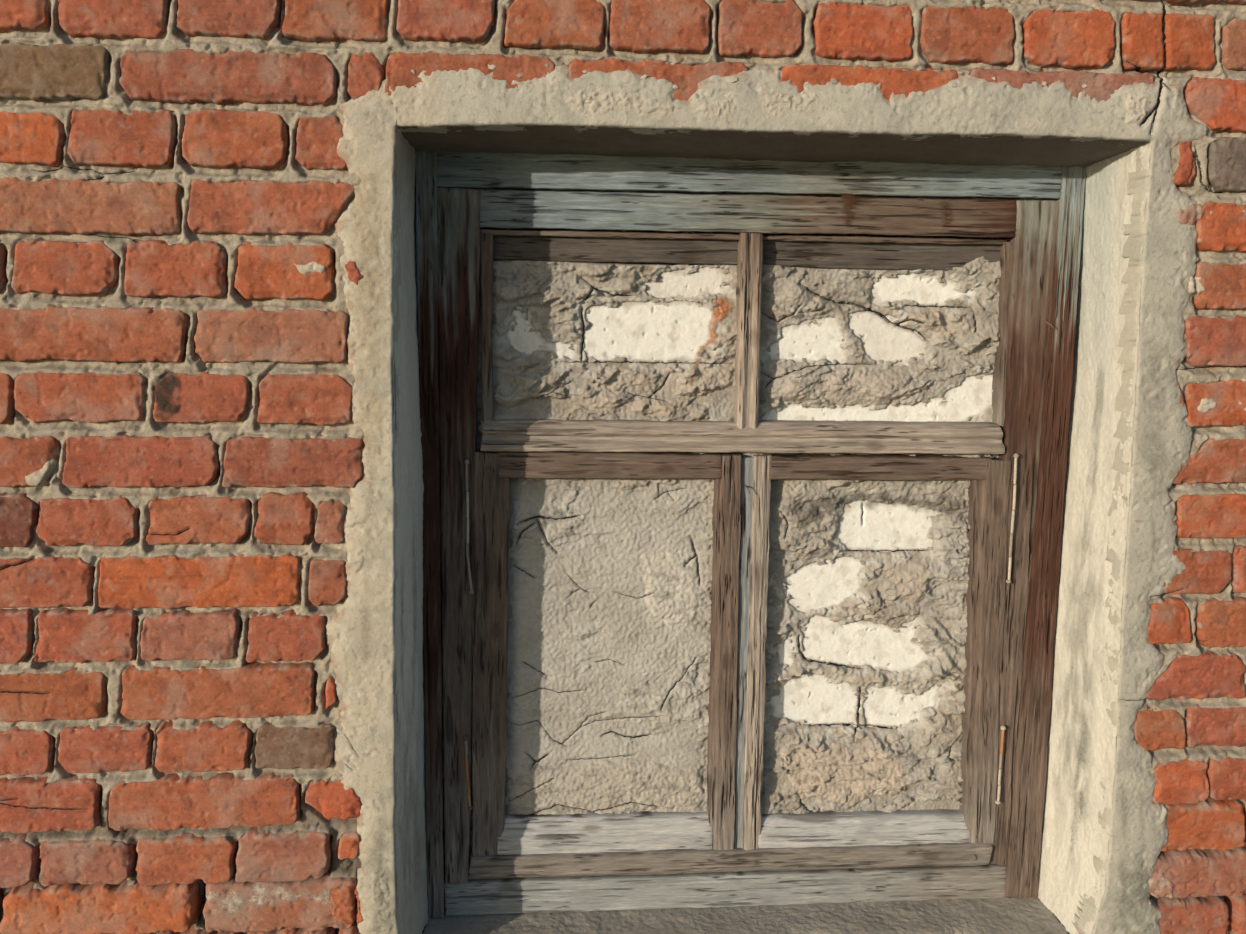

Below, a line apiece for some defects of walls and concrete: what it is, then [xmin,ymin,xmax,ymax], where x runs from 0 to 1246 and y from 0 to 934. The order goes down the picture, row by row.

peeling [384,52,748,105]
peeling [779,64,1154,103]
crack [1129,0,1171,133]
spalling [506,264,731,363]
crack [537,279,731,402]
rust [691,298,730,383]
crack [761,284,976,342]
spalling [765,273,974,366]
spalling [758,373,993,422]
crack [516,515,654,599]
spalling [766,499,943,730]
crack [508,659,695,814]